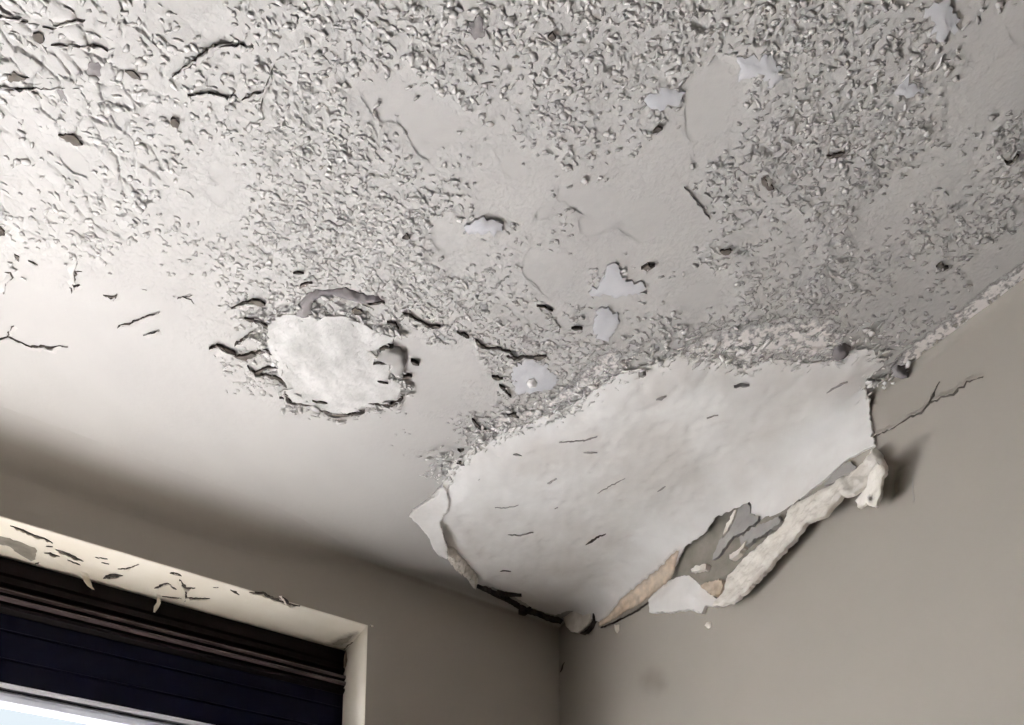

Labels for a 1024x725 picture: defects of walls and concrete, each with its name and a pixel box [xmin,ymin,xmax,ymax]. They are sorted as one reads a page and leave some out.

crack [172,43,274,110]
crack [684,187,710,220]
peeling [0,0,1024,485]
crack [67,259,194,339]
crack [0,325,69,354]
crack [872,372,985,438]
flaking render [409,320,891,635]
peeling [0,536,37,561]
peeling [80,571,94,590]